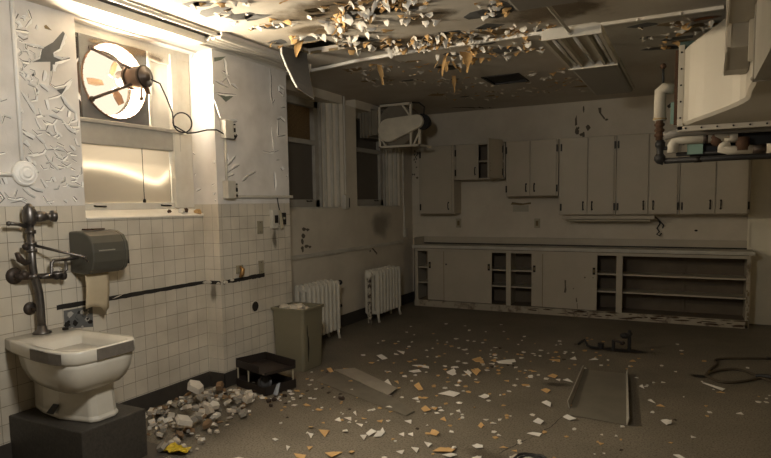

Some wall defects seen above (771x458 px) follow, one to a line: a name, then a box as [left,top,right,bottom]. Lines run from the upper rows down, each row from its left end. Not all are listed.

spalling [0,10,84,205]
peeling [626,18,718,50]